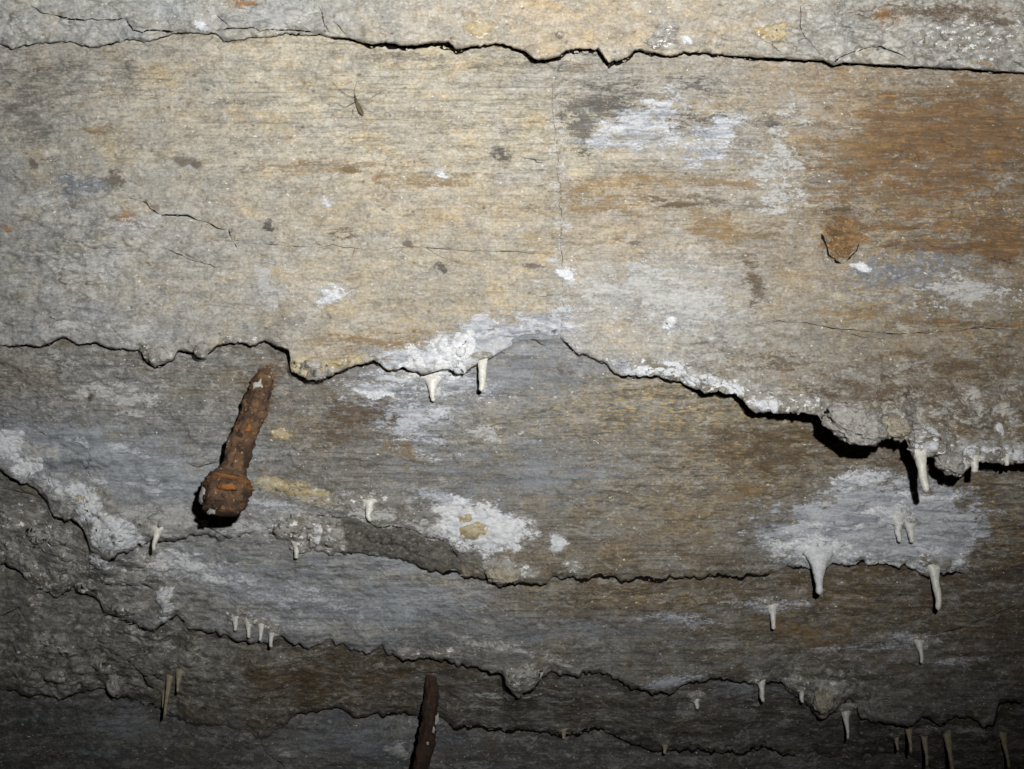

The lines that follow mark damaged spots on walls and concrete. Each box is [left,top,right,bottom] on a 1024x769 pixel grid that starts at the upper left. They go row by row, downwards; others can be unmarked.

crack [0,4,1024,308]
crack [3,317,278,369]
crack [293,360,419,381]
crack [531,337,848,432]
rust [200,472,255,510]
damp [0,205,1024,713]
crack [0,471,223,638]
crack [313,514,964,589]
crack [5,651,163,709]
crack [292,707,416,719]
crack [381,645,1024,729]